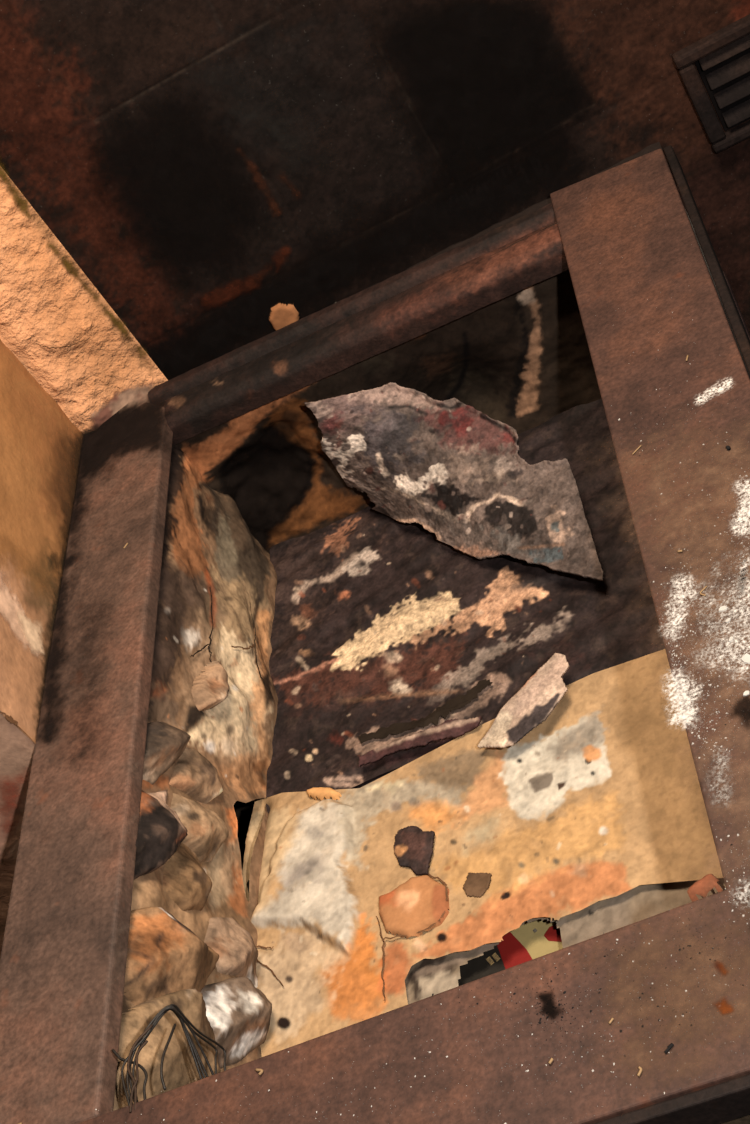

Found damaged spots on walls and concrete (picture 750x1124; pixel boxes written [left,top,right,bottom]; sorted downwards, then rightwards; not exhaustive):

leakage [0,163,30,216]
leakage [48,244,127,336]
rust [358,716,482,767]